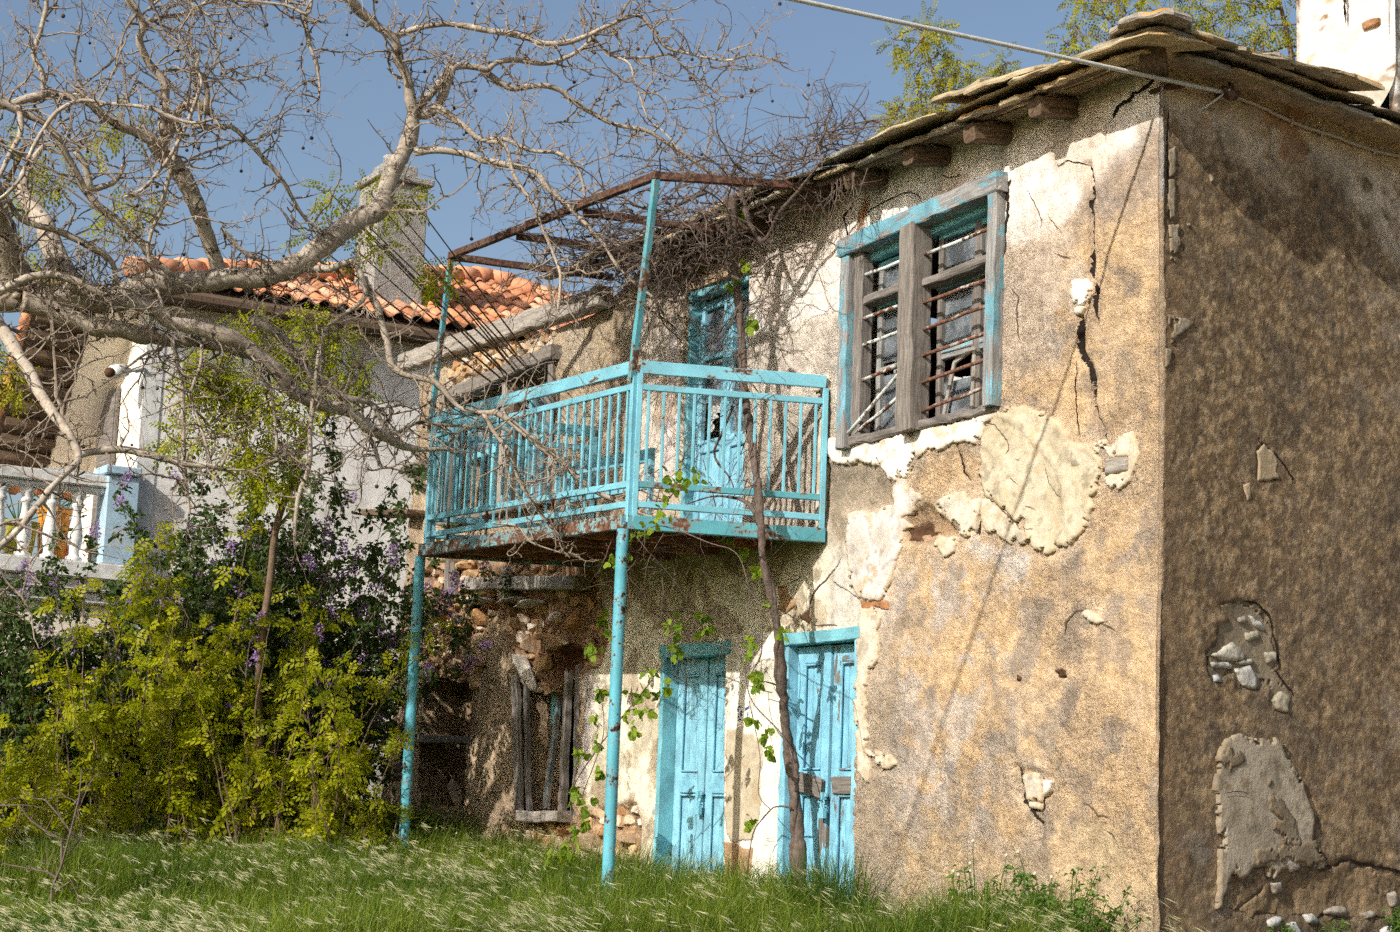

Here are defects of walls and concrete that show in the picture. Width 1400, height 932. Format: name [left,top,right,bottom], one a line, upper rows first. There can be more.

crack [1106,79,1170,224]
crack [1003,160,1107,437]
flaking render [814,374,1027,783]
spalling [1206,600,1294,712]
flaking render [1019,766,1055,824]
peeling [1215,746,1245,772]
spalling [1233,777,1400,932]